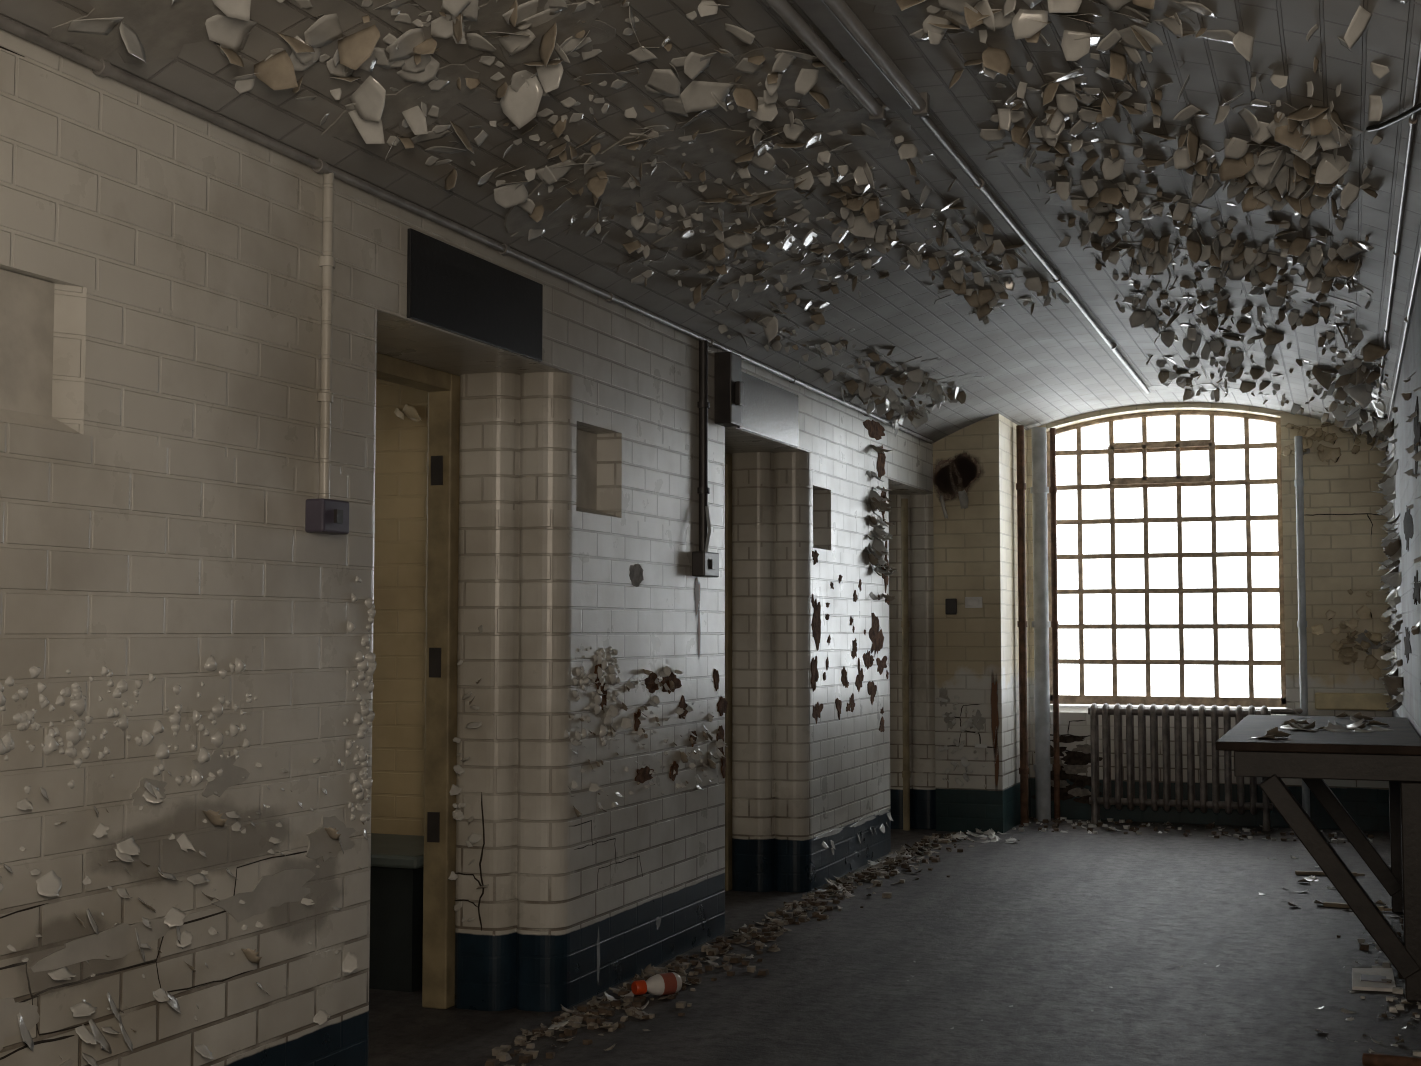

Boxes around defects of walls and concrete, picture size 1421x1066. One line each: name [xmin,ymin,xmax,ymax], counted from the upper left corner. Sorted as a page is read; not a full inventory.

peeling [48,0,1070,732]
peeling [857,0,1421,712]
peeling [567,664,728,818]
peeling [7,747,369,1021]
peeling [0,997,40,1051]
peeling [58,991,137,1066]